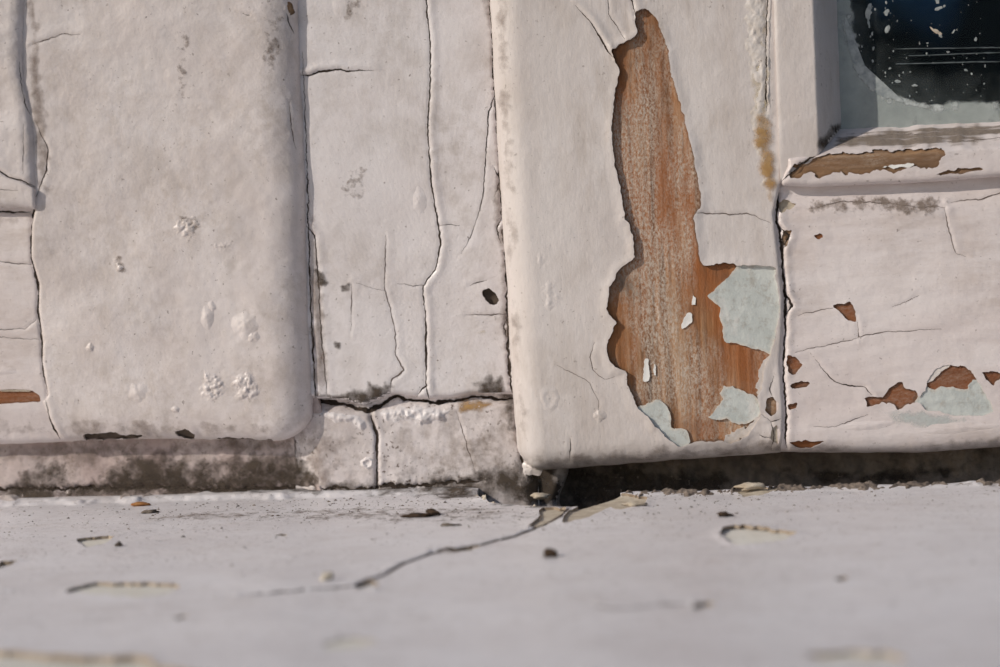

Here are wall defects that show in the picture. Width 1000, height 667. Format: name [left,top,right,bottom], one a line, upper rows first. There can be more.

crack [575,0,635,55]
peeling [789,148,983,179]
crack [0,33,78,437]
crack [286,0,513,490]
peeling [606,9,780,447]
peeling [0,389,40,404]
peeling [864,365,1000,416]
leakage [6,454,323,498]
leakage [364,466,728,518]
leakage [815,471,846,482]
leakage [860,468,950,483]
crack [242,509,569,595]